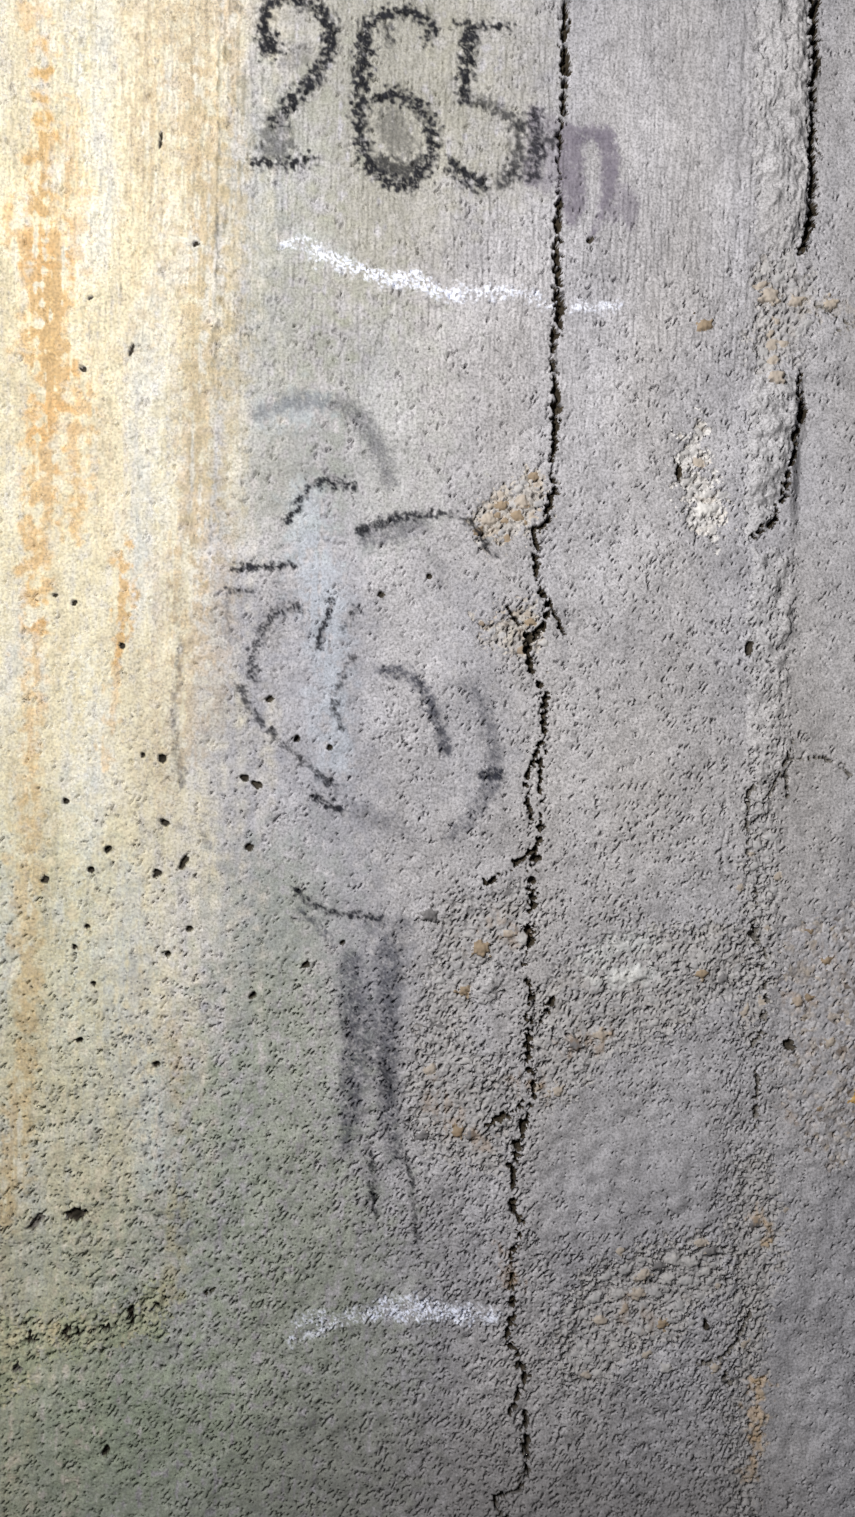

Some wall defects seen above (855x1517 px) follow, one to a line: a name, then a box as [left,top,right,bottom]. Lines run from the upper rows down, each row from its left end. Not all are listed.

corrosion [19,67,76,441]
crack [797,0,824,256]
crack [750,371,808,540]
crack [482,1,573,1517]
crack [696,1307,756,1385]